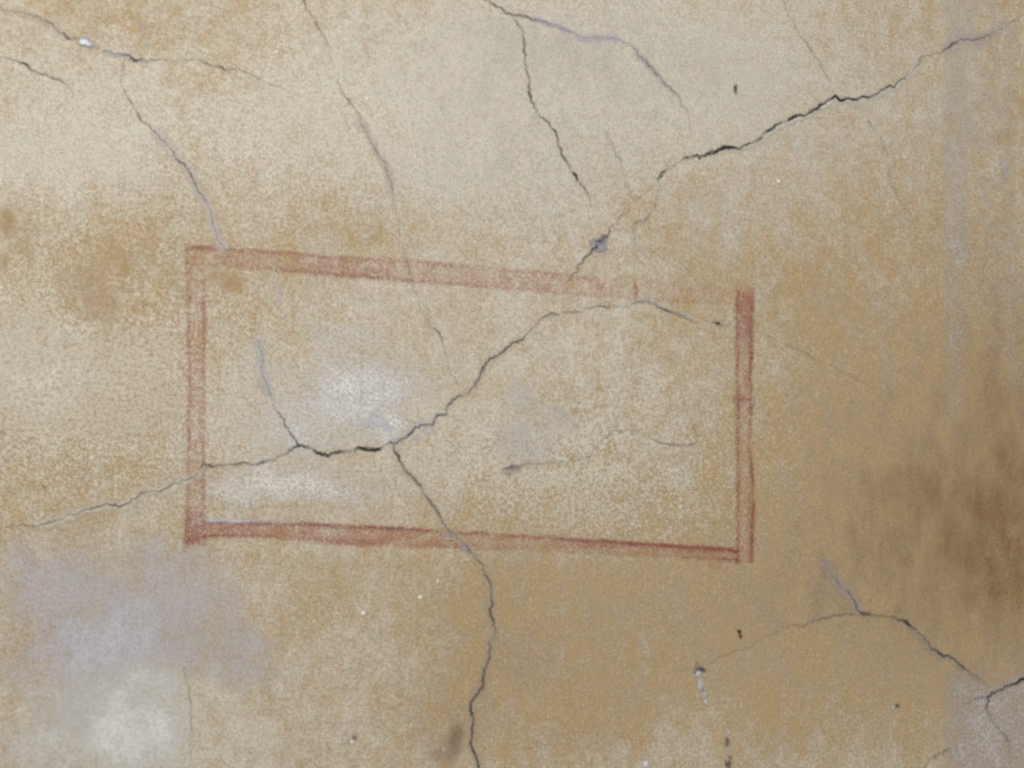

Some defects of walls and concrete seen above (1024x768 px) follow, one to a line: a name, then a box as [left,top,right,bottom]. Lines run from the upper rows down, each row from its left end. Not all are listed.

crack [60,28,148,62]
crack [659,68,916,177]
crack [151,129,229,251]
crack [289,339,523,501]
crack [34,461,265,529]
crack [469,577,497,768]
crack [900,619,1024,706]